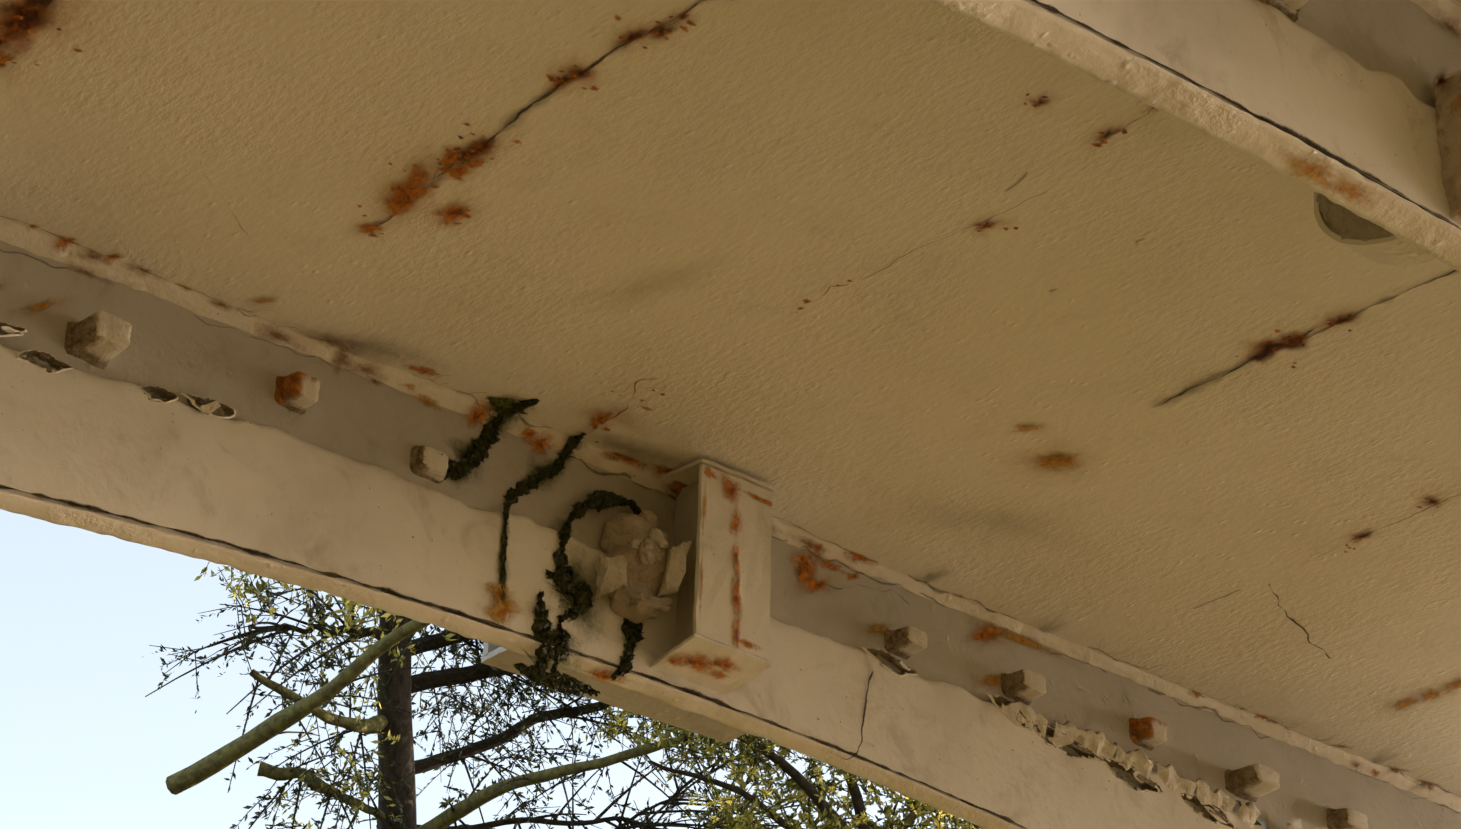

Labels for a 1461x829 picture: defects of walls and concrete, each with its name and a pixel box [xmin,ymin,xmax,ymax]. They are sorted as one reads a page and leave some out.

rust [0,0,62,68]
rust [615,15,695,49]
rust [548,65,598,91]
rust [387,123,494,214]
rust [436,206,471,225]
rust [1291,159,1371,204]
spalling [0,322,74,374]
rust [668,466,772,678]
rust [794,539,873,591]
crack [1196,494,1460,658]
crack [0,485,1027,829]
peeling [988,694,1261,829]